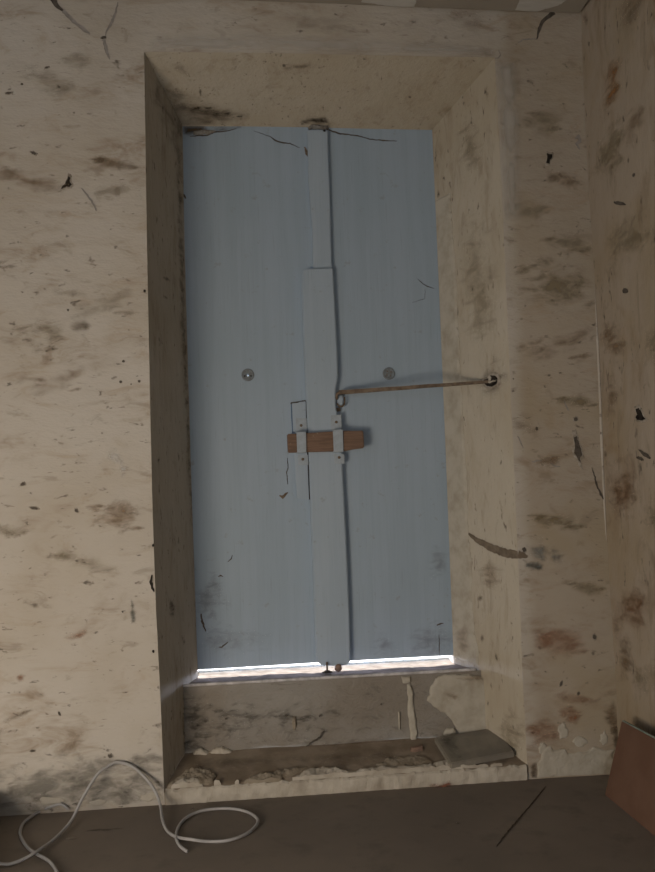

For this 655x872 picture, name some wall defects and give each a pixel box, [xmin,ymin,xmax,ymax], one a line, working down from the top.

crack [50,0,118,59]
crack [495,12,555,59]
crack [190,128,300,148]
crack [329,129,394,141]
flaking render [427,674,486,736]
water stain [9,766,96,805]
flaking render [165,723,618,805]